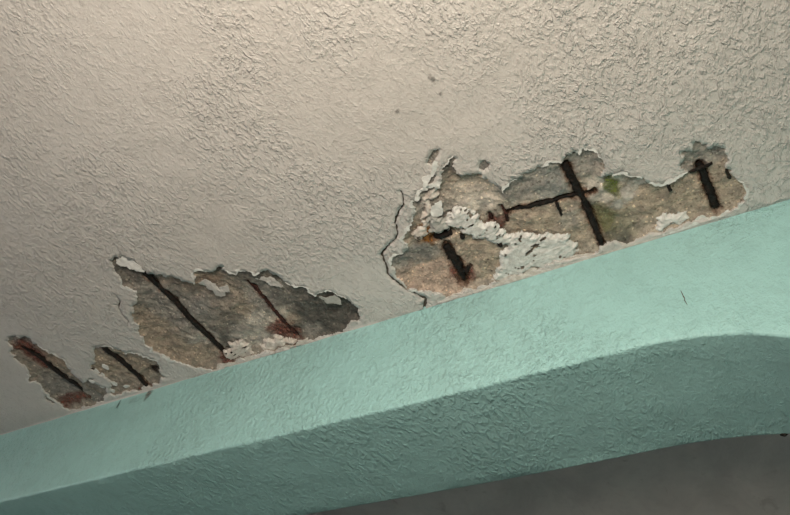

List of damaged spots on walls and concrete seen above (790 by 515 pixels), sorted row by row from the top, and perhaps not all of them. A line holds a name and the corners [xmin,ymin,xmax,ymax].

crack [381,191,427,307]
spalling [388,141,749,302]
spalling [8,256,360,410]